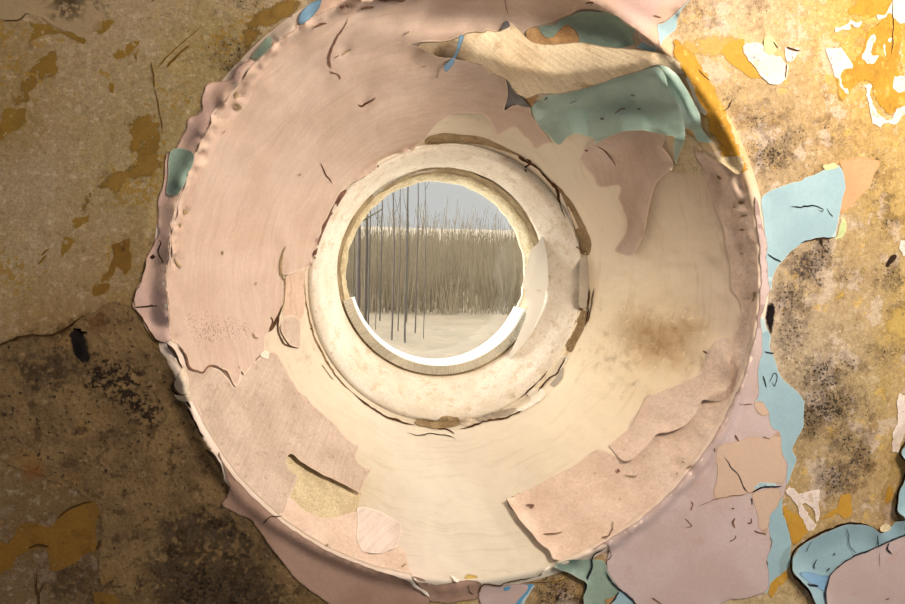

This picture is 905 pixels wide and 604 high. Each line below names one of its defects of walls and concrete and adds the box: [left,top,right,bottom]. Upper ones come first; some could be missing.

peeling [862,34,892,64]
peeling [877,0,905,24]
peeling [865,84,905,127]
peeling [132,36,274,343]
peeling [165,0,880,604]
damp [766,303,775,333]
damp [794,251,817,285]
damp [22,357,66,382]
damp [58,327,162,435]
spalling [0,302,535,604]
damp [152,508,279,604]
peeling [793,521,905,604]